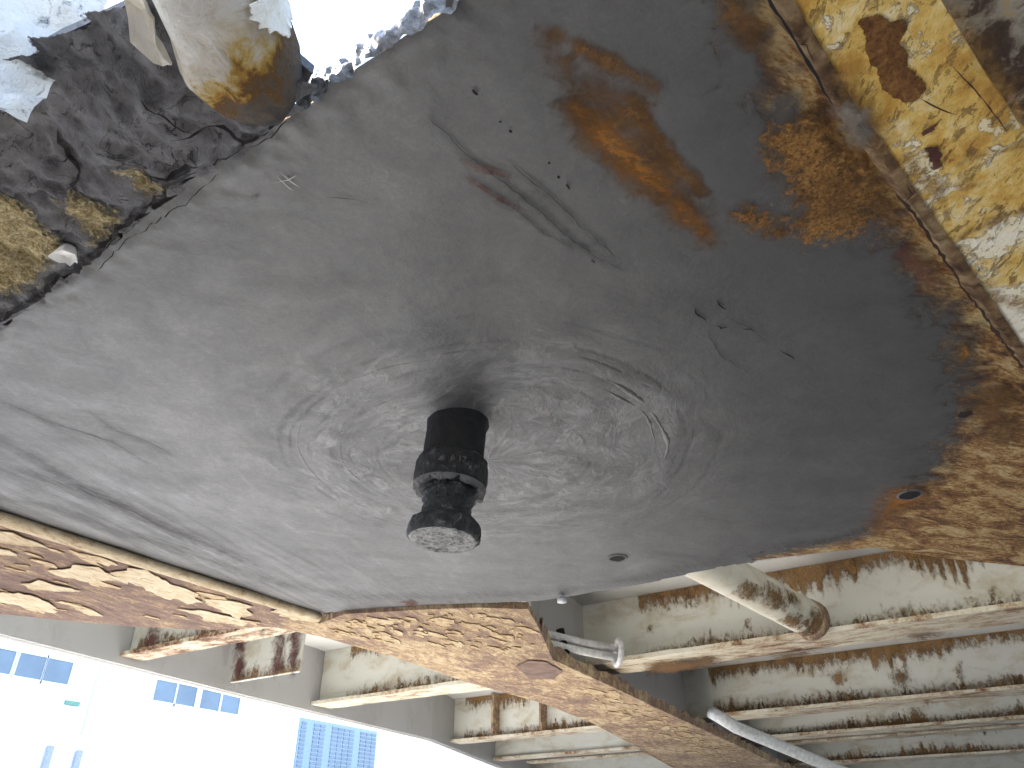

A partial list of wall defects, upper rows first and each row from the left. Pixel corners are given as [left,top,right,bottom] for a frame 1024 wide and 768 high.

crack [0,99,285,322]
peeling [124,0,172,66]
peeling [249,0,293,38]
corrosion [547,29,712,245]
crack [768,0,835,109]
corrosion [731,112,886,247]
peeling [858,14,926,103]
crack [952,65,1008,134]
crack [895,186,1024,368]
peeling [0,531,261,626]
corrosion [638,551,1024,735]
corrosion [826,731,1024,761]